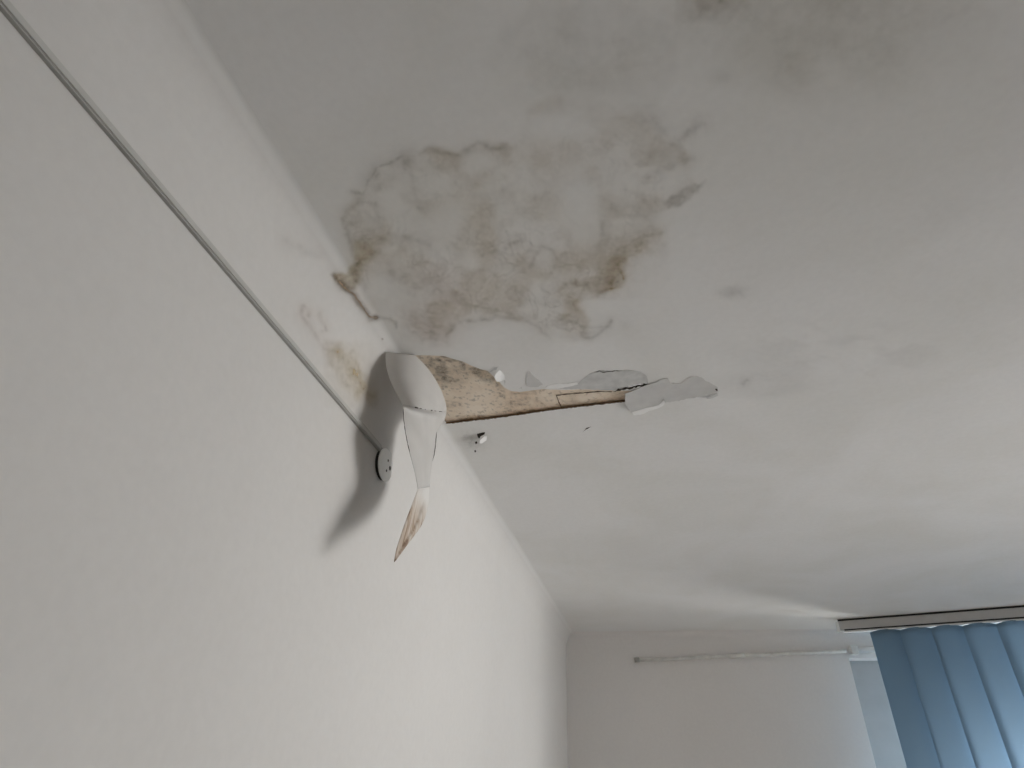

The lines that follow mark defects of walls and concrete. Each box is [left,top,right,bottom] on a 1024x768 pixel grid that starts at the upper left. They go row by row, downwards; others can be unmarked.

spalling [386,353,718,562]